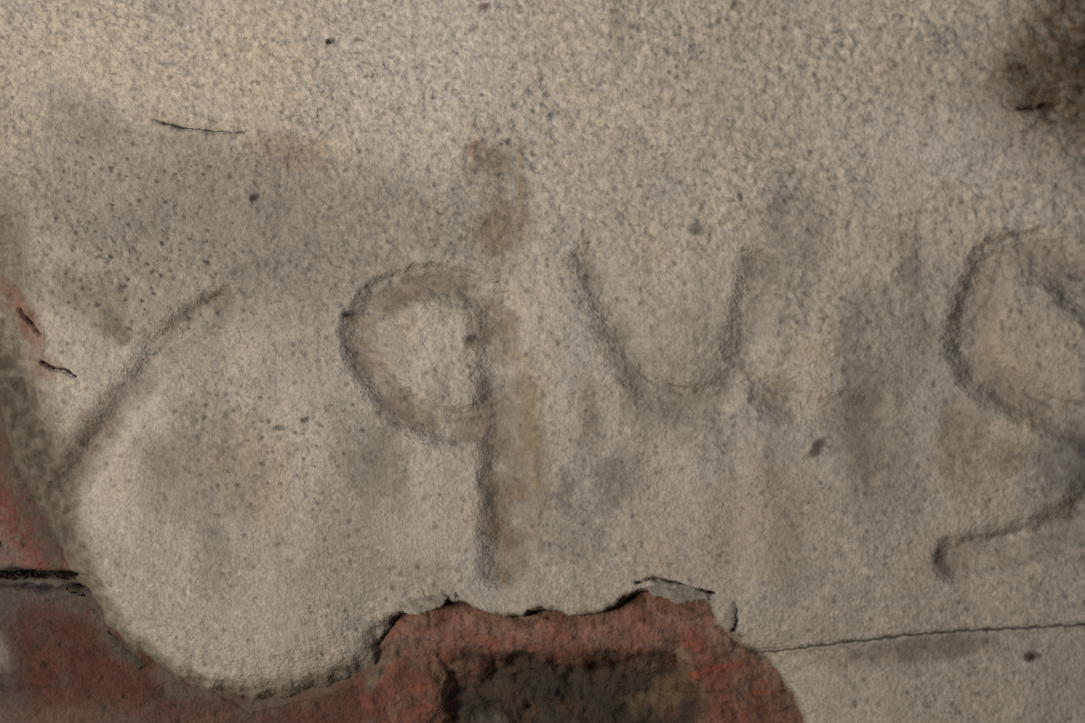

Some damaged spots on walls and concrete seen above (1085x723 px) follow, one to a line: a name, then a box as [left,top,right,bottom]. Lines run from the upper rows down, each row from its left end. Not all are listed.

spalling [0,408,802,723]
crack [744,623,1085,653]